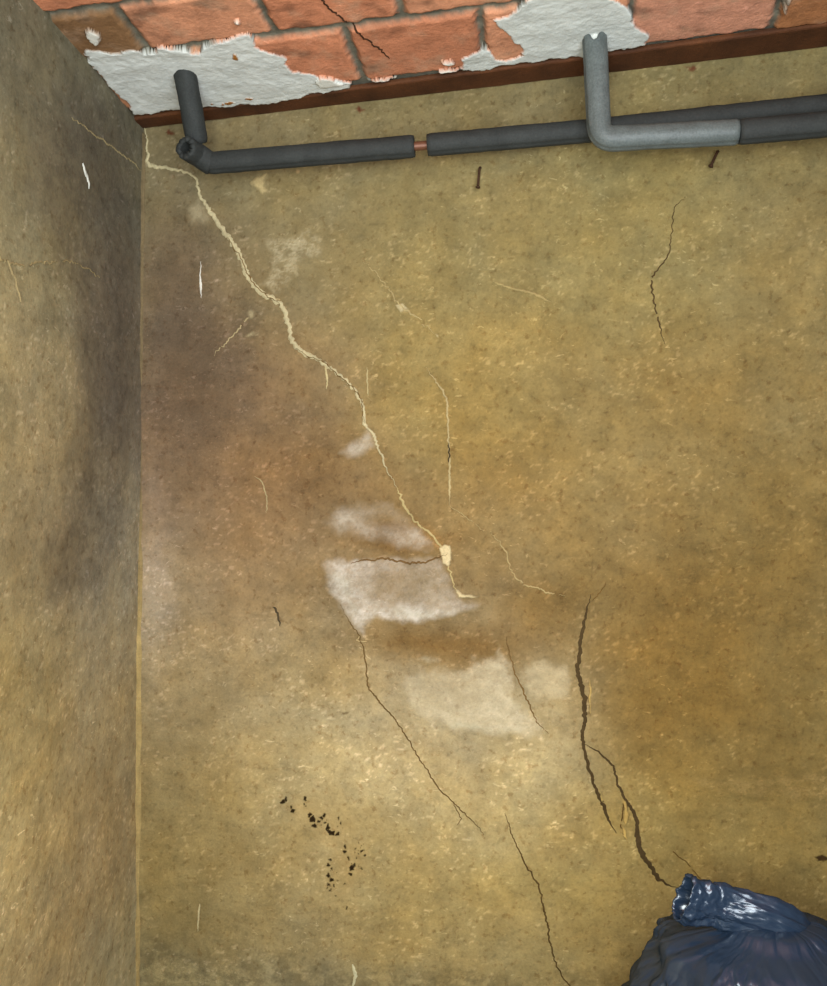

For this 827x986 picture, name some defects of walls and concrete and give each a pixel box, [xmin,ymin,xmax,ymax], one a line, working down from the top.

peeling [83,18,352,115]
crack [321,0,390,59]
peeling [367,75,397,83]
peeling [439,0,650,74]
crack [71,117,456,589]
leakage [337,424,379,460]
leakage [319,499,574,744]
crack [340,604,484,835]
crack [575,583,701,888]
crack [505,815,570,986]